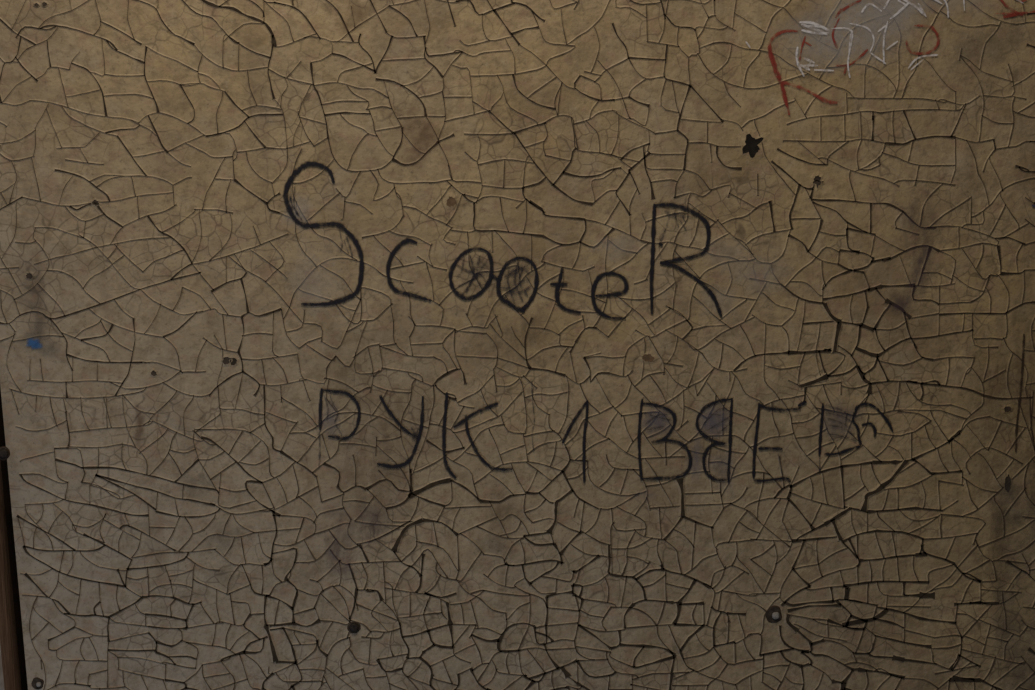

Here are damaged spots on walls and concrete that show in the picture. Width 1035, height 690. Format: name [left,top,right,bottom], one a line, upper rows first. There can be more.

crack [0,0,736,690]
crack [291,0,1035,690]